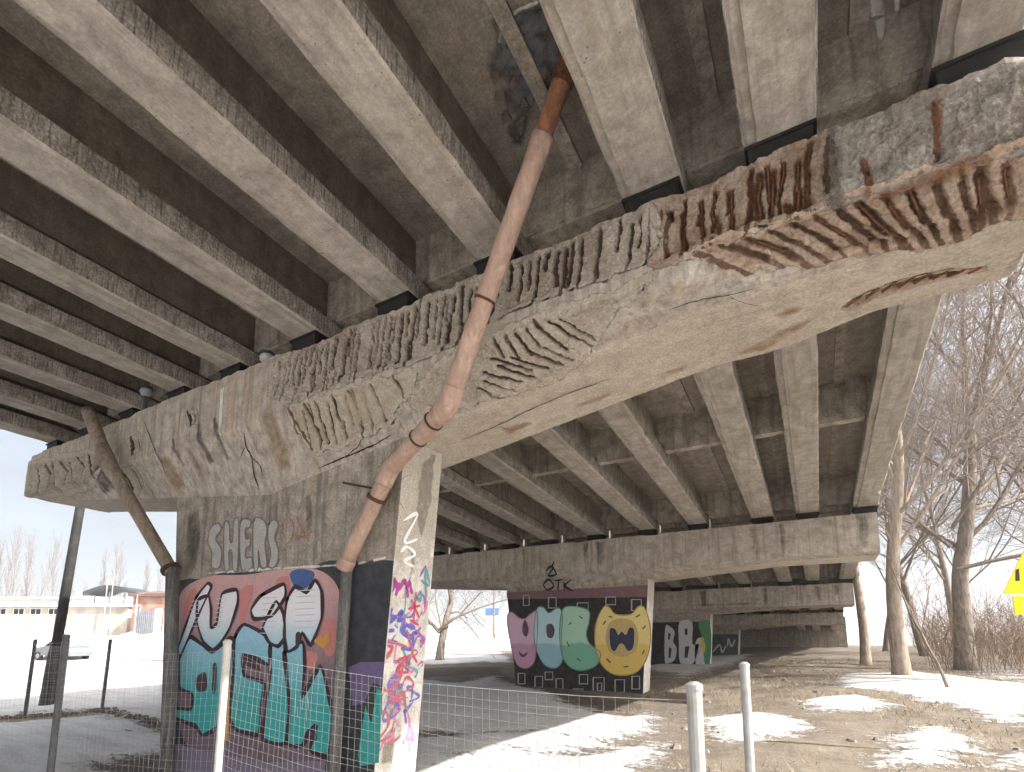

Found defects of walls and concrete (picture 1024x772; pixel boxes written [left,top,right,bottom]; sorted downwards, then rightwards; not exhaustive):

water stain [492,29,535,144]
water stain [514,4,561,88]
spalling [459,59,1024,410]
crack [670,289,761,310]
spalling [267,273,484,456]
spalling [24,448,101,498]
crack [241,433,263,489]
crack [318,435,391,469]